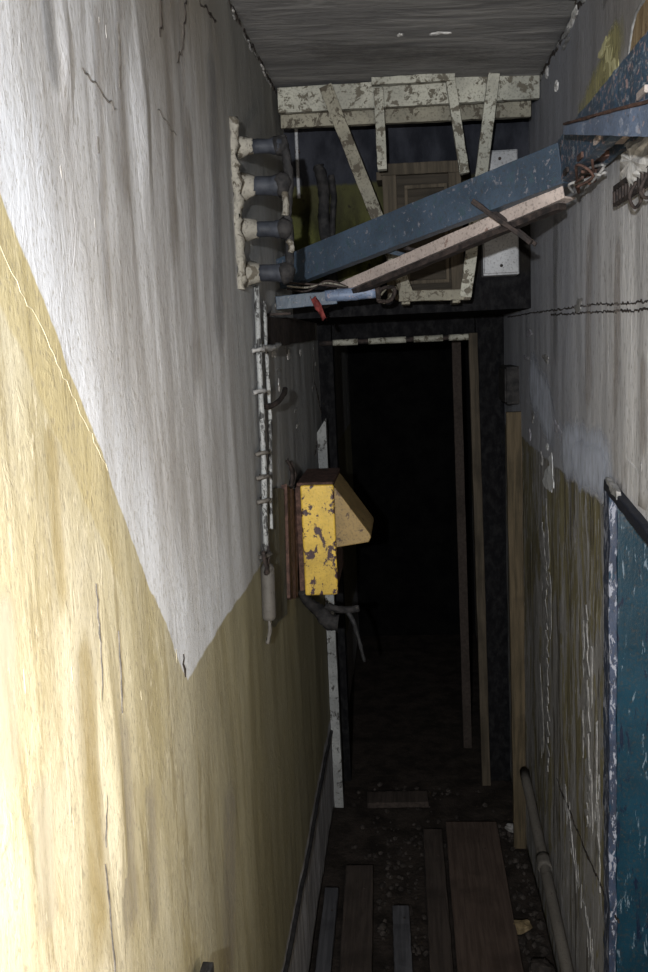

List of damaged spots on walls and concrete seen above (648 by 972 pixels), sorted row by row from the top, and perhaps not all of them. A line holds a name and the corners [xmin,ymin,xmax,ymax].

crack [159,0,217,63]
spalling [557,0,586,50]
peeling [597,36,619,82]
crack [82,67,117,110]
crack [507,299,648,318]
crack [95,584,123,713]
crack [105,794,116,972]